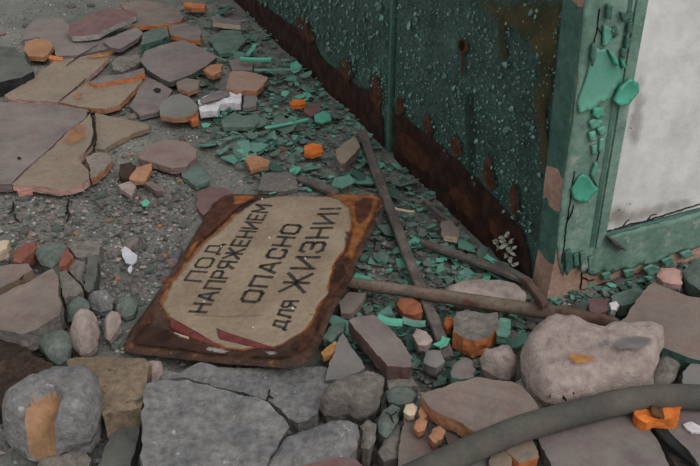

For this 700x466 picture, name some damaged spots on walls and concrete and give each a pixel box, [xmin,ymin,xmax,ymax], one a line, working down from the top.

corrosion [234,0,384,148]
corrosion [393,96,531,278]
peeling [397,1,561,233]
crack [561,171,575,264]
peeling [564,248,611,281]
crack [594,8,602,43]
peeling [571,3,639,203]